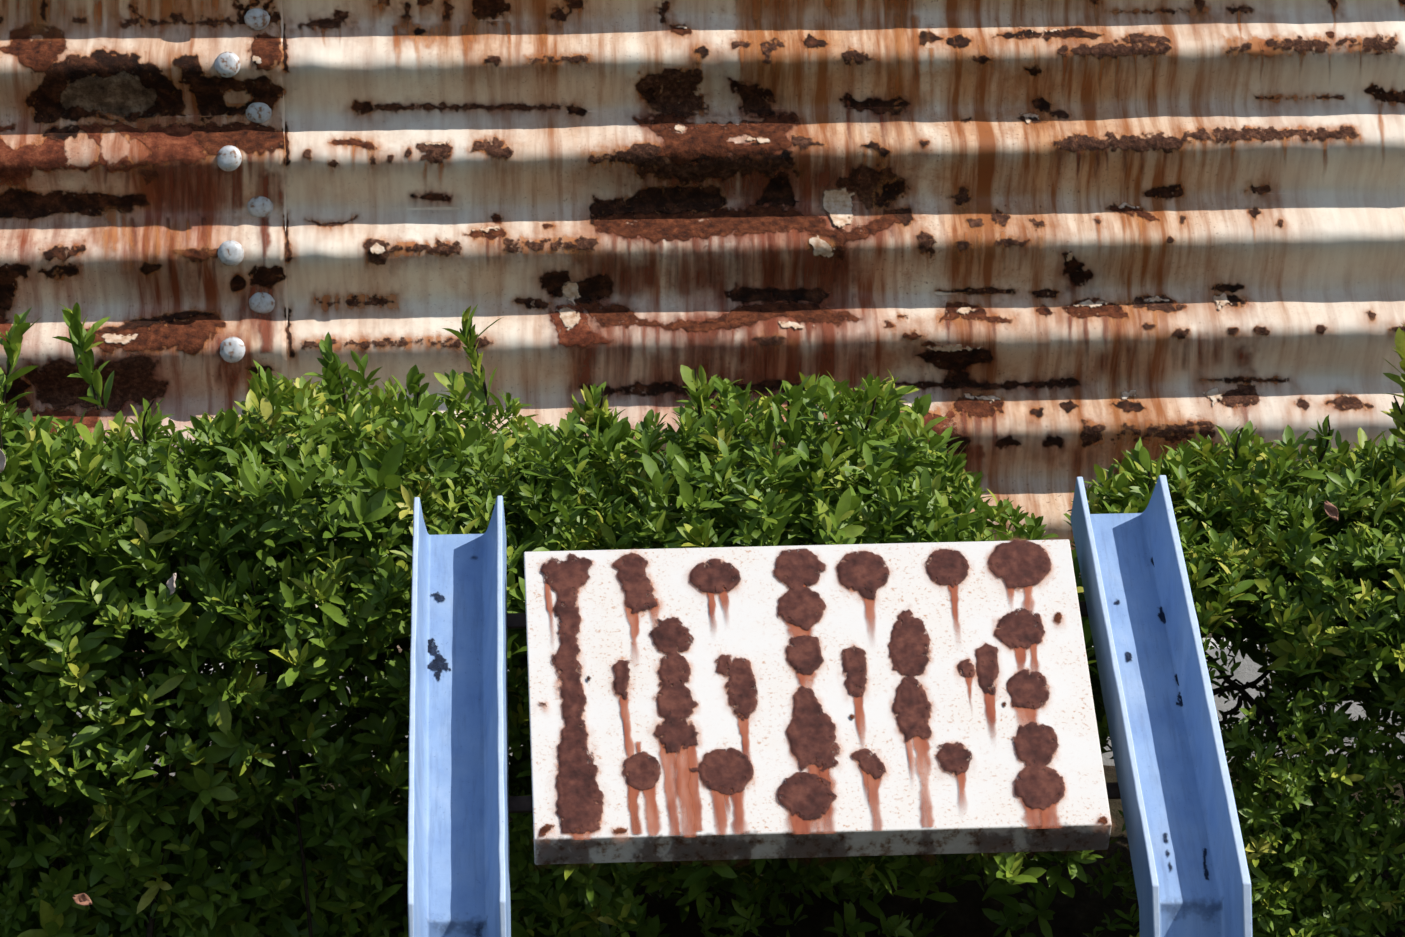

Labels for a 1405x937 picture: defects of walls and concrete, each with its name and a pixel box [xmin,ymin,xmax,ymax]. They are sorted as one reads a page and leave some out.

corrosion [1225,0,1398,70]
corrosion [1023,46,1042,76]
corrosion [351,100,373,115]
corrosion [1020,96,1069,123]
corrosion [328,137,453,174]
corrosion [1051,125,1362,174]
corrosion [373,0,995,409]
corrosion [949,186,1046,259]
corrosion [312,294,399,314]
corrosion [302,335,494,353]
corrosion [884,302,1021,479]